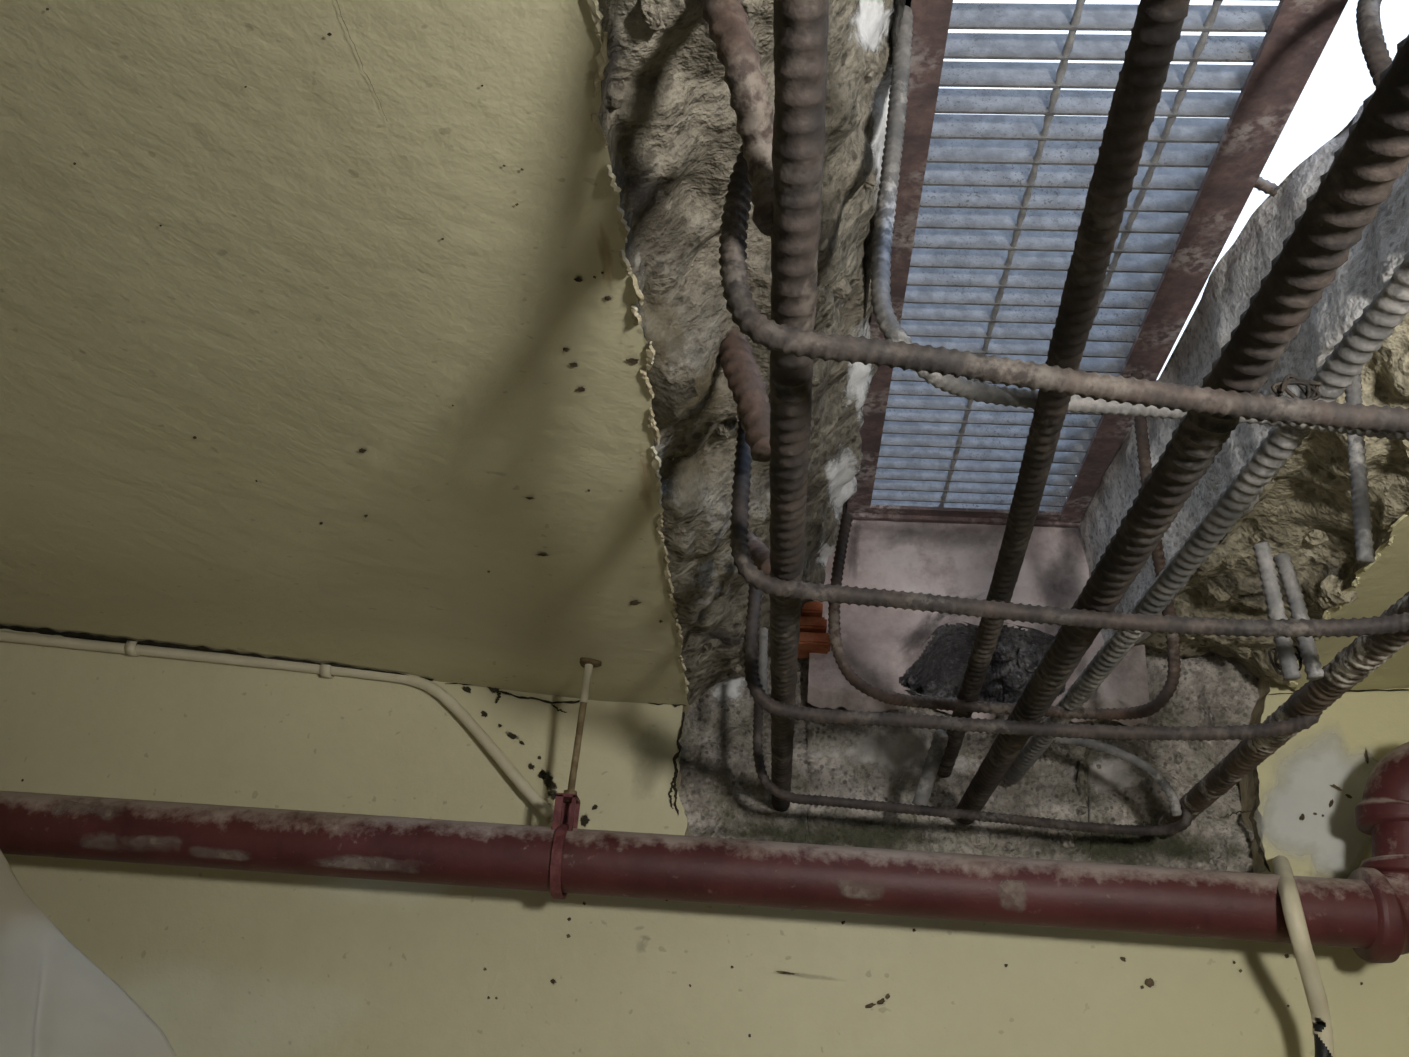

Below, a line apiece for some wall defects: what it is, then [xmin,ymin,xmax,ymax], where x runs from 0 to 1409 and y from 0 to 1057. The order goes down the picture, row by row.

crack [0,624,589,713]
spalling [587,0,1409,873]